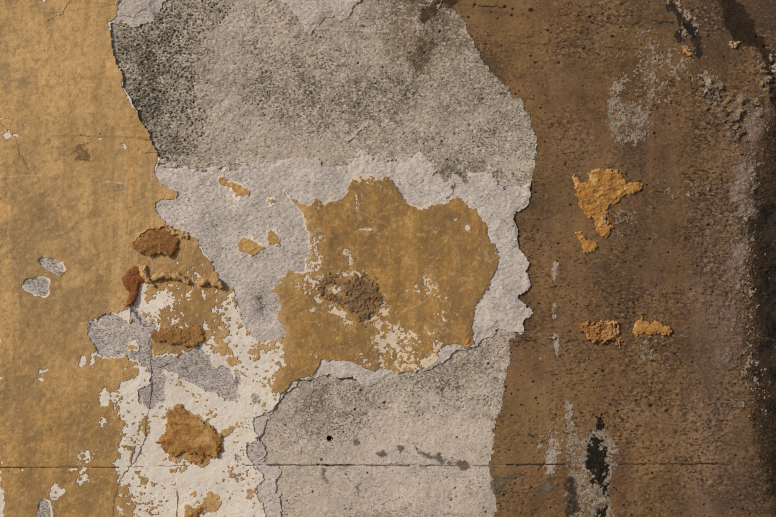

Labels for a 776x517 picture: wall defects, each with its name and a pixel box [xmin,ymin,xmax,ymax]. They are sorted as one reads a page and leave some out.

peeling [21,256,66,298]
peeling [65,0,538,517]
damp [704,0,776,515]
peeling [0,461,23,517]
peeling [36,482,65,517]
crack [245,460,565,468]
spalling [564,401,619,517]
crack [618,459,729,467]